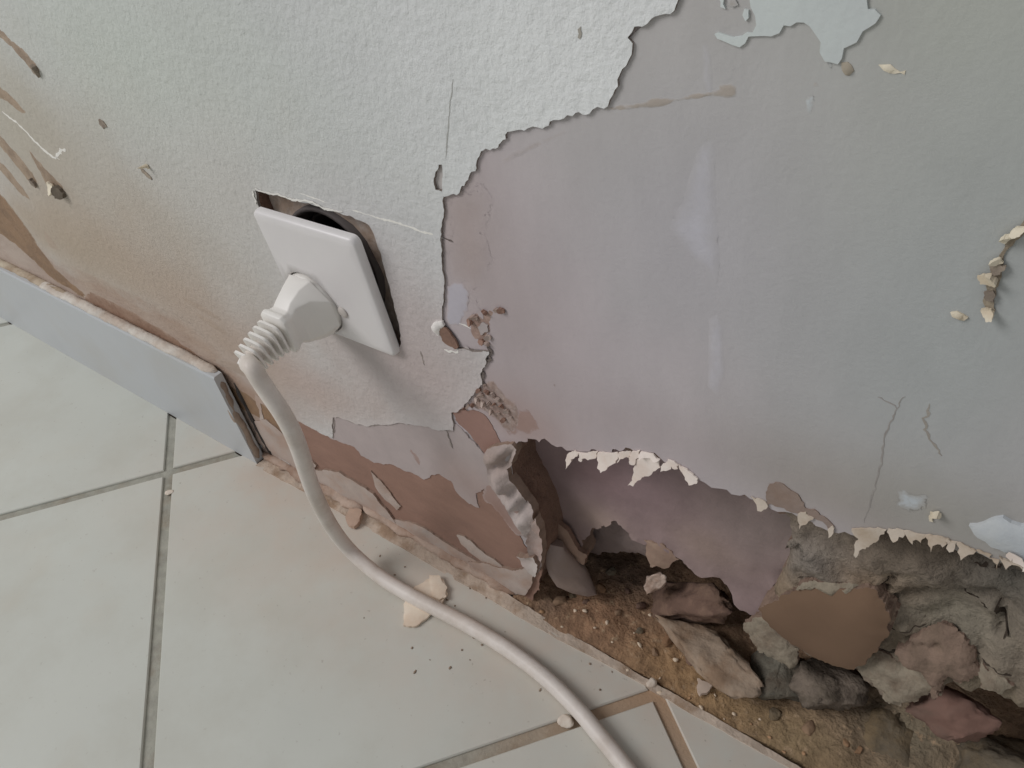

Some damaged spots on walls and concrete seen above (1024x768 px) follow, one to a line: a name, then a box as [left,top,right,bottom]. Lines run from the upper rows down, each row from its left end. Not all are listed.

peeling [298,0,1024,744]
flaking render [254,419,301,482]
crack [864,397,942,523]